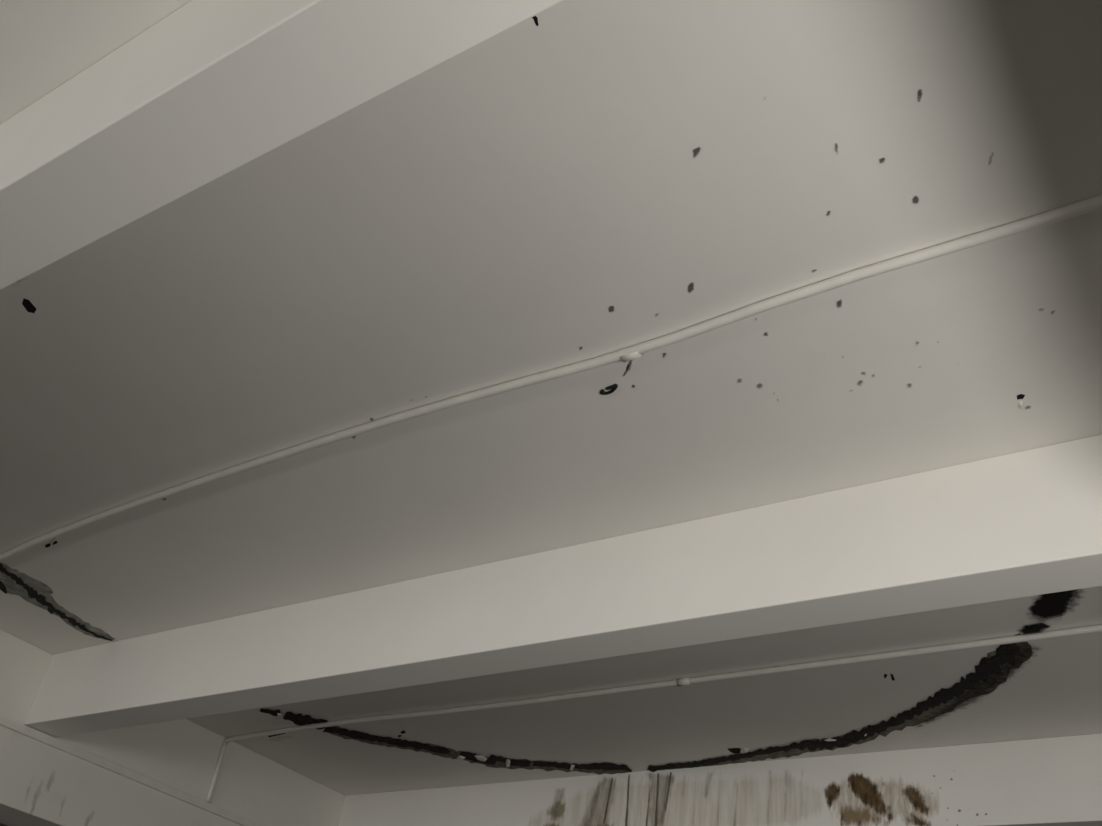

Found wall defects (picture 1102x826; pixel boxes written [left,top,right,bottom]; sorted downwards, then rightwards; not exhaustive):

crack [0,562,115,641]
crack [260,589,1080,775]
corrosion [825,774,893,825]
corrosion [905,787,930,826]